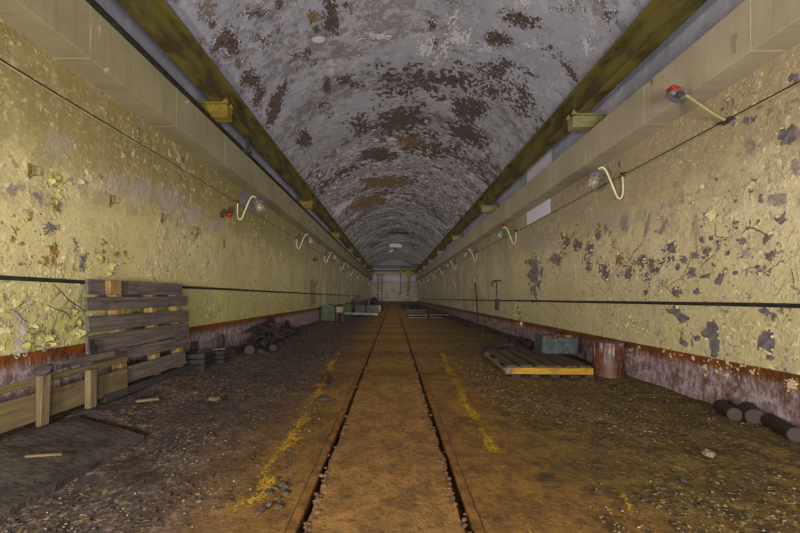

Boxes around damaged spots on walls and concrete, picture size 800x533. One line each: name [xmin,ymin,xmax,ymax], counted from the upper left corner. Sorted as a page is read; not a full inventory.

peeling [1,171,85,269]
damp [333,198,355,218]
peeling [72,239,132,277]
peeling [524,203,789,326]
peeling [0,295,86,359]
peeling [662,319,760,378]
peeling [757,307,777,361]